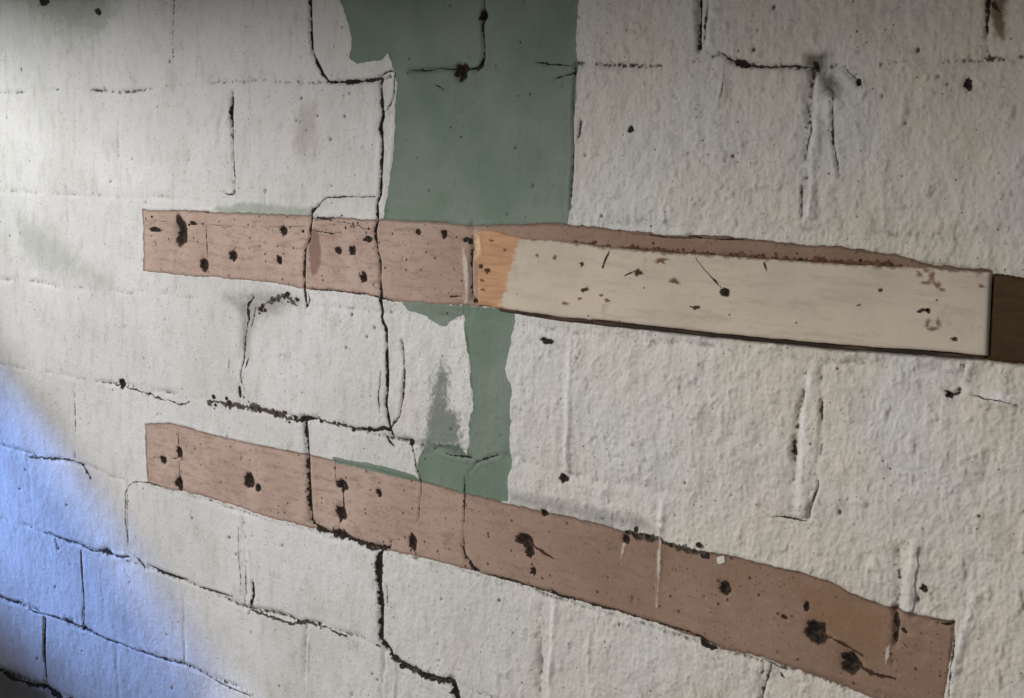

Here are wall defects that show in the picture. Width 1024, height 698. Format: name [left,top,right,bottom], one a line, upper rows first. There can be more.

crack [204,101,236,273]
crack [228,296,256,398]
spalling [258,291,299,314]
crack [302,0,487,513]
peeling [142,0,993,309]
crack [699,0,862,176]
crack [1,432,255,698]
crack [297,415,461,698]
peeling [145,302,955,698]
crack [790,439,798,461]
crack [772,479,819,521]